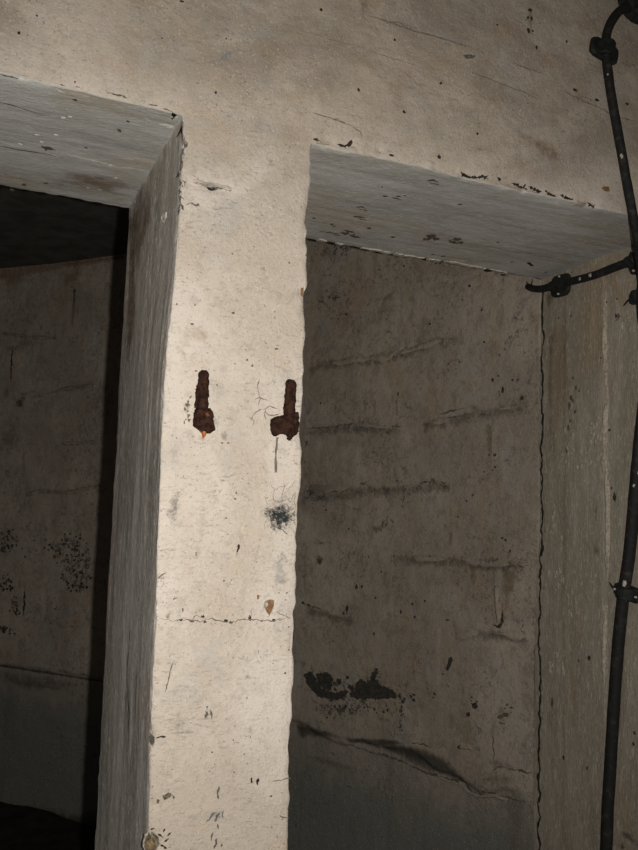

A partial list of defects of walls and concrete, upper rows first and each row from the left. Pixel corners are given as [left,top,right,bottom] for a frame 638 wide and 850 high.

crack [159,610,289,624]
crack [330,292,547,850]